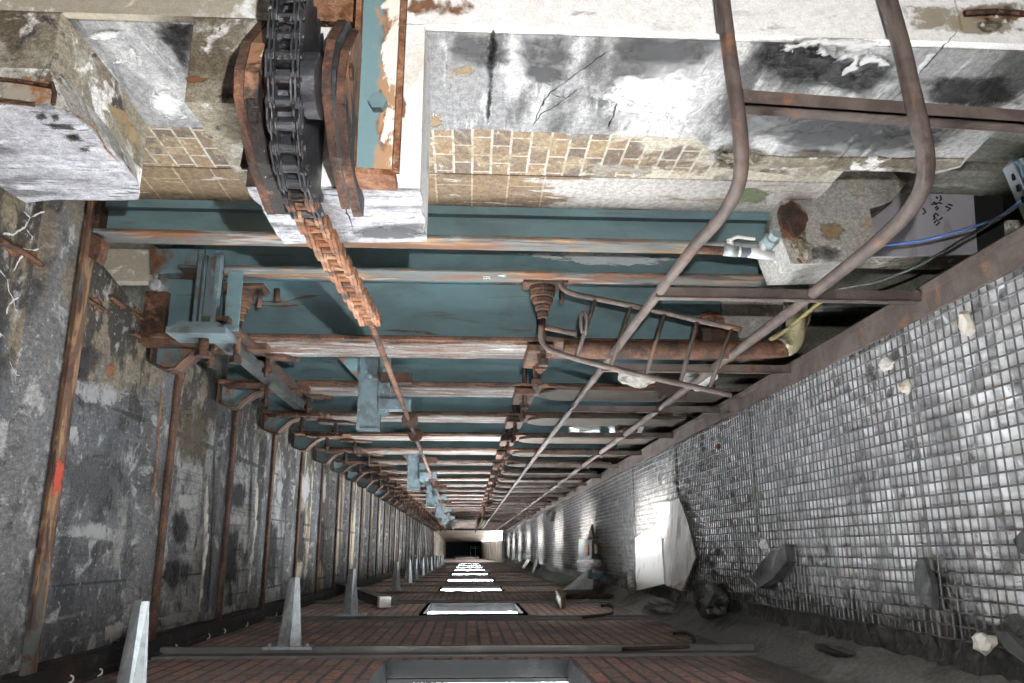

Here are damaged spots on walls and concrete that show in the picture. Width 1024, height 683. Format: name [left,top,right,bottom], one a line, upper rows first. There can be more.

leakage [911,3,1023,34]
leakage [157,23,191,67]
leakage [784,38,889,76]
crack [533,49,612,125]
rust [779,222,806,263]